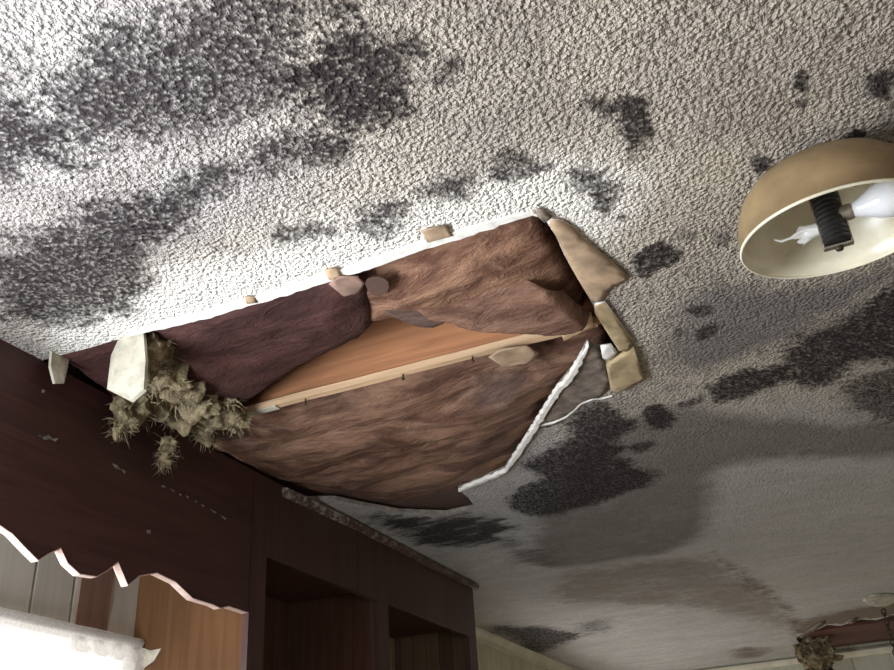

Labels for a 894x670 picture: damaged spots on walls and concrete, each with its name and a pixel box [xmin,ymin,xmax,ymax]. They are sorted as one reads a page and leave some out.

water stain [586,96,655,151]
water stain [844,129,866,139]
water stain [0,0,428,328]
water stain [751,157,772,173]
water stain [355,171,477,239]
water stain [564,166,626,221]
water stain [629,242,683,279]
spalling [107,207,552,402]
peeling [48,351,69,384]
peeling [458,341,617,492]
water stain [505,285,894,565]
water stain [492,621,605,652]